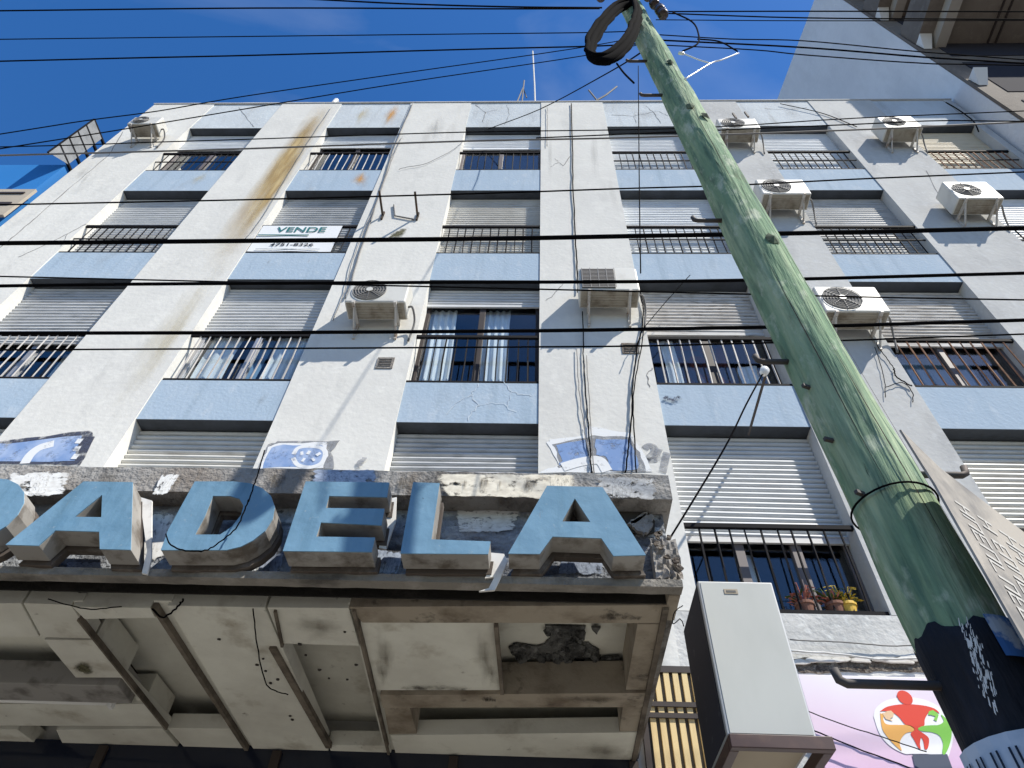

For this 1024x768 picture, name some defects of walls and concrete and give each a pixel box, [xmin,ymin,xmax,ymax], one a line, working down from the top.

rust [248,130,309,219]
peeling [9,471,69,496]
peeling [455,510,519,532]
peeling [598,477,684,572]